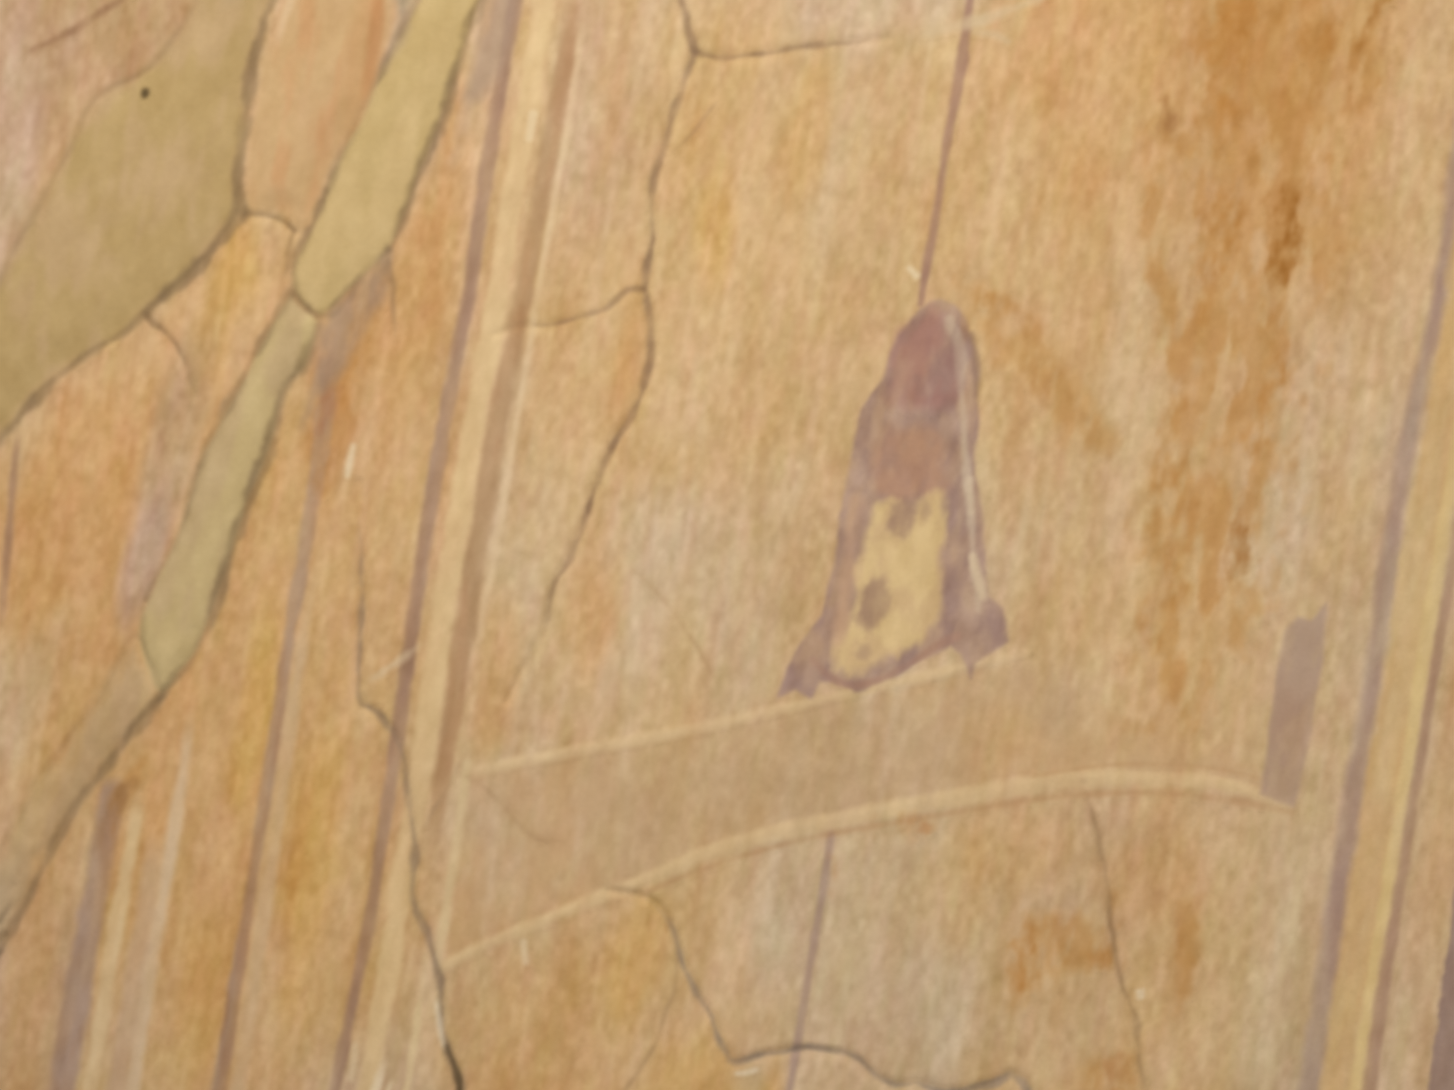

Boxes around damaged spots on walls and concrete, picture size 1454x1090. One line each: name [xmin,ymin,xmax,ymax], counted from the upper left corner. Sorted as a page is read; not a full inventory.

crack [0,0,479,958]
crack [510,0,876,674]
crack [351,504,469,1090]
crack [618,891,1037,1090]
crack [1083,790,1153,1090]